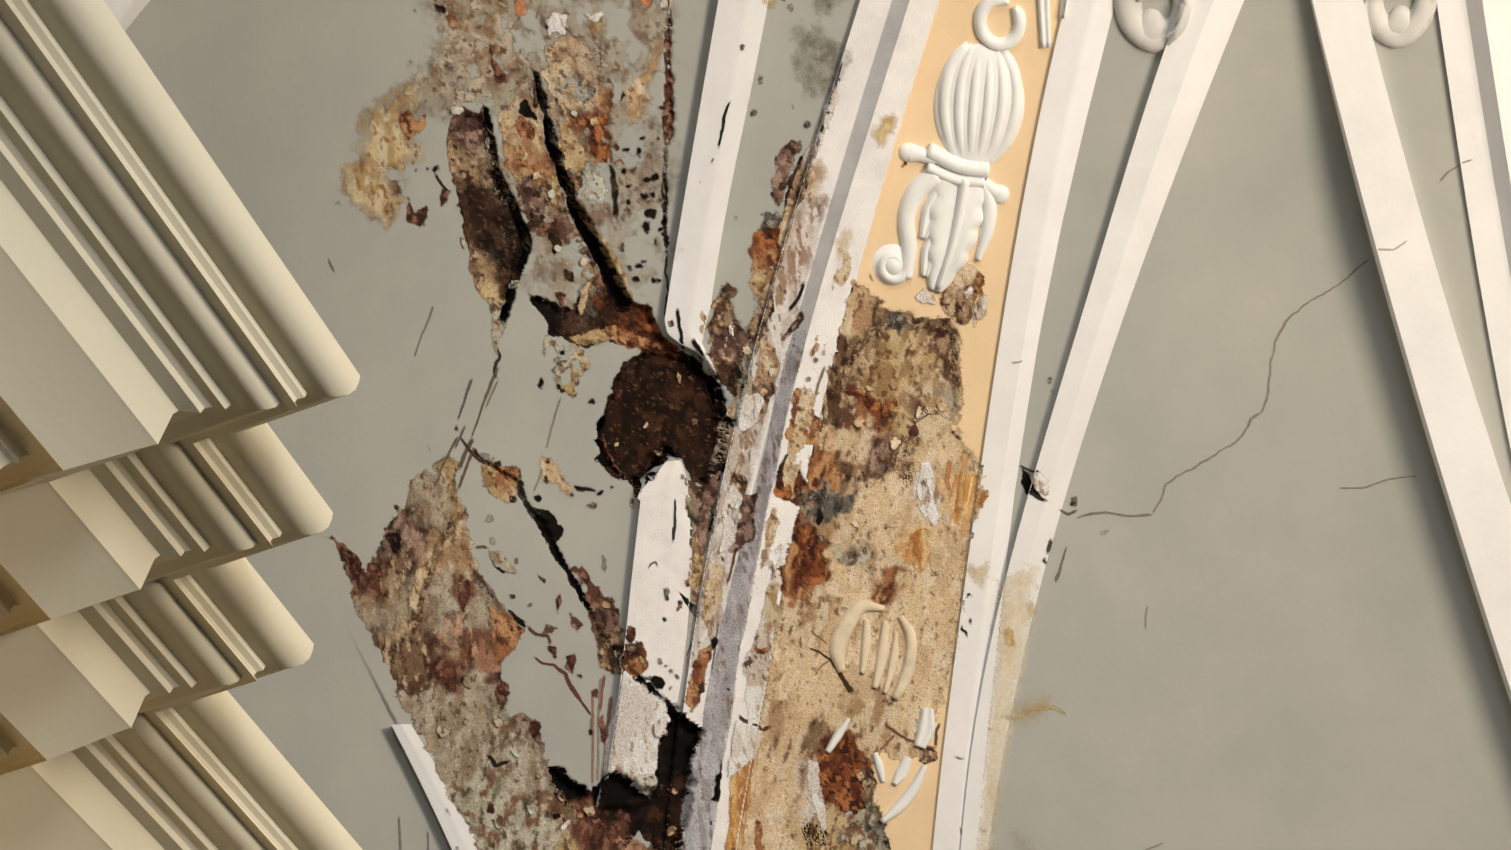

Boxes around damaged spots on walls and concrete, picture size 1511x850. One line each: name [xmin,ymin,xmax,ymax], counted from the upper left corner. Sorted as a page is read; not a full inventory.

crack [519,0,675,315]
spalling [641,0,673,13]
crack [711,103,730,162]
spalling [330,11,989,850]
crack [1078,242,1416,535]